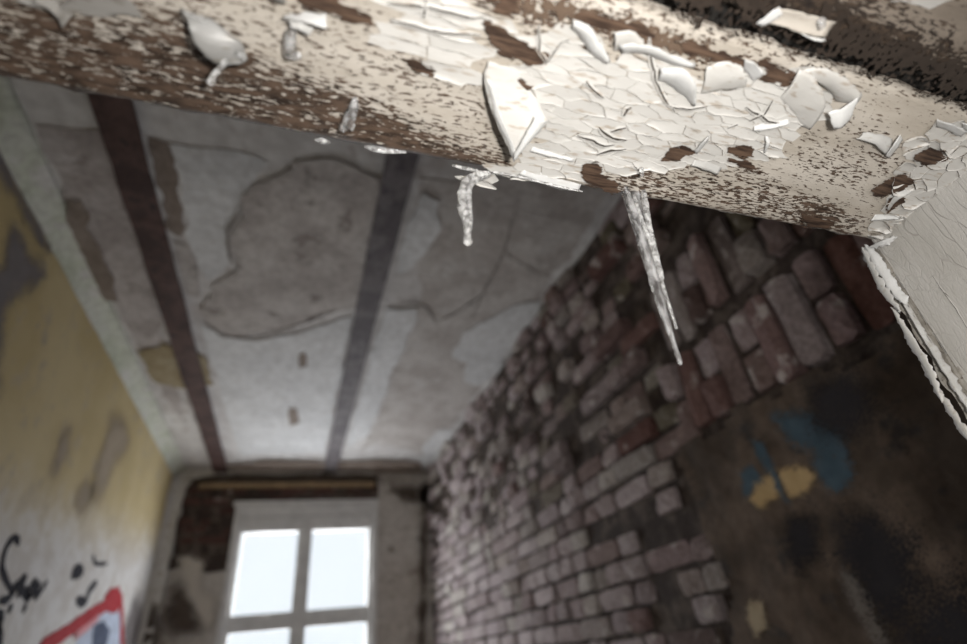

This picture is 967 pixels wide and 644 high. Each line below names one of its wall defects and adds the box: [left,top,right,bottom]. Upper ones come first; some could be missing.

peeling [18,0,143,29]
peeling [181,8,248,65]
peeling [891,0,950,9]
peeling [0,154,54,259]
spalling [37,125,170,351]
peeling [275,0,862,473]
spalling [148,137,382,472]
leakage [832,564,893,644]